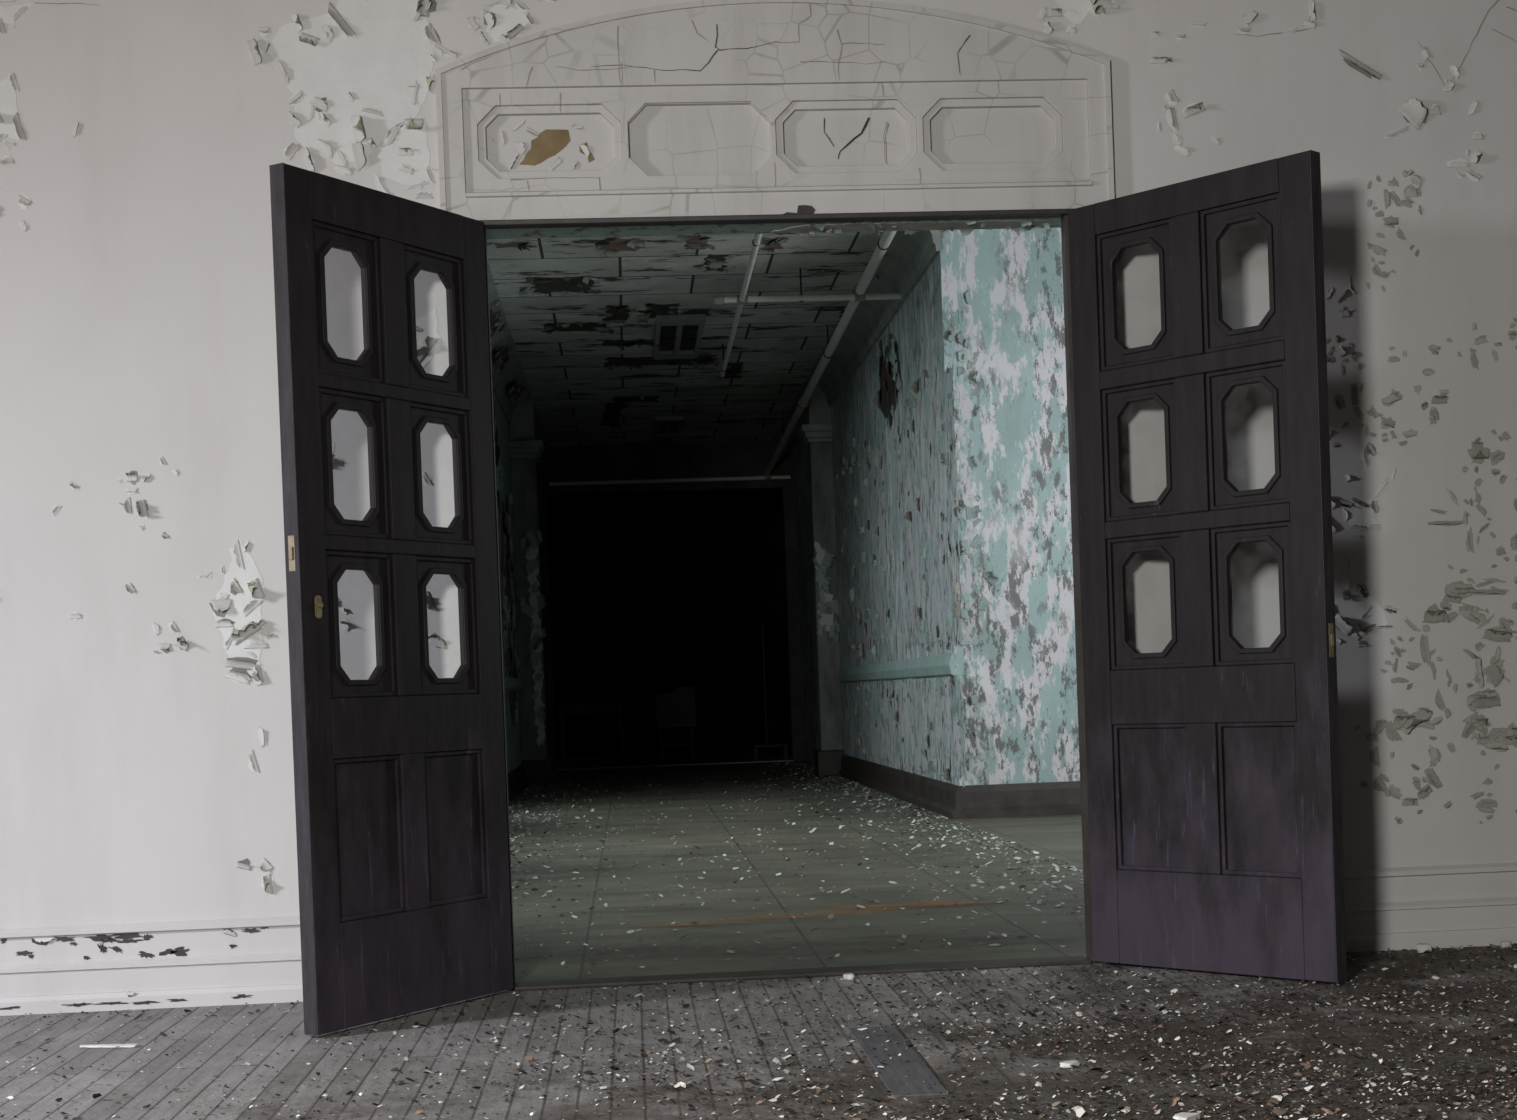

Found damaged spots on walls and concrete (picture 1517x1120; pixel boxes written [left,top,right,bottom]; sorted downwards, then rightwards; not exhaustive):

peeling [247,0,458,199]
peeling [490,119,595,171]
crack [511,177,601,190]
crack [499,3,921,181]
peeling [758,205,1050,253]
crack [1234,0,1316,37]
crack [1416,0,1517,93]
peeling [813,290,998,661]
peeling [197,536,276,686]
peeling [1331,429,1517,825]
peeling [854,674,990,787]
spalling [0,933,189,960]